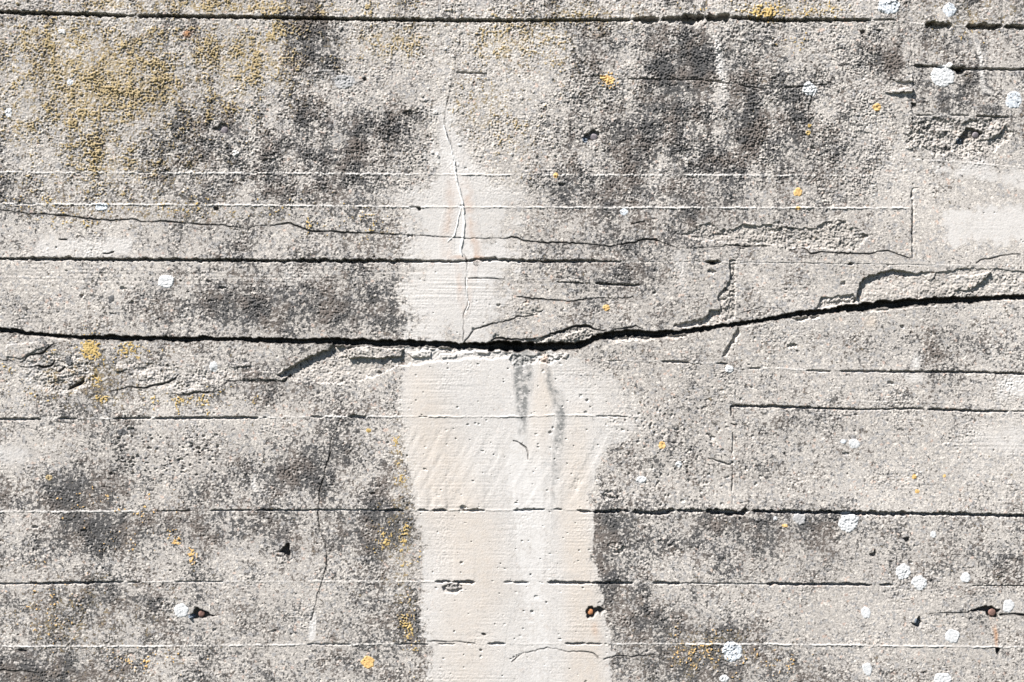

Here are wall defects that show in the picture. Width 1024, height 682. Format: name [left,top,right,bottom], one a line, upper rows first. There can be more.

crack [443,28,463,167]
damp [712,30,729,114]
crack [805,59,823,160]
crack [0,174,1024,373]
damp [377,92,648,682]
crack [310,419,341,621]